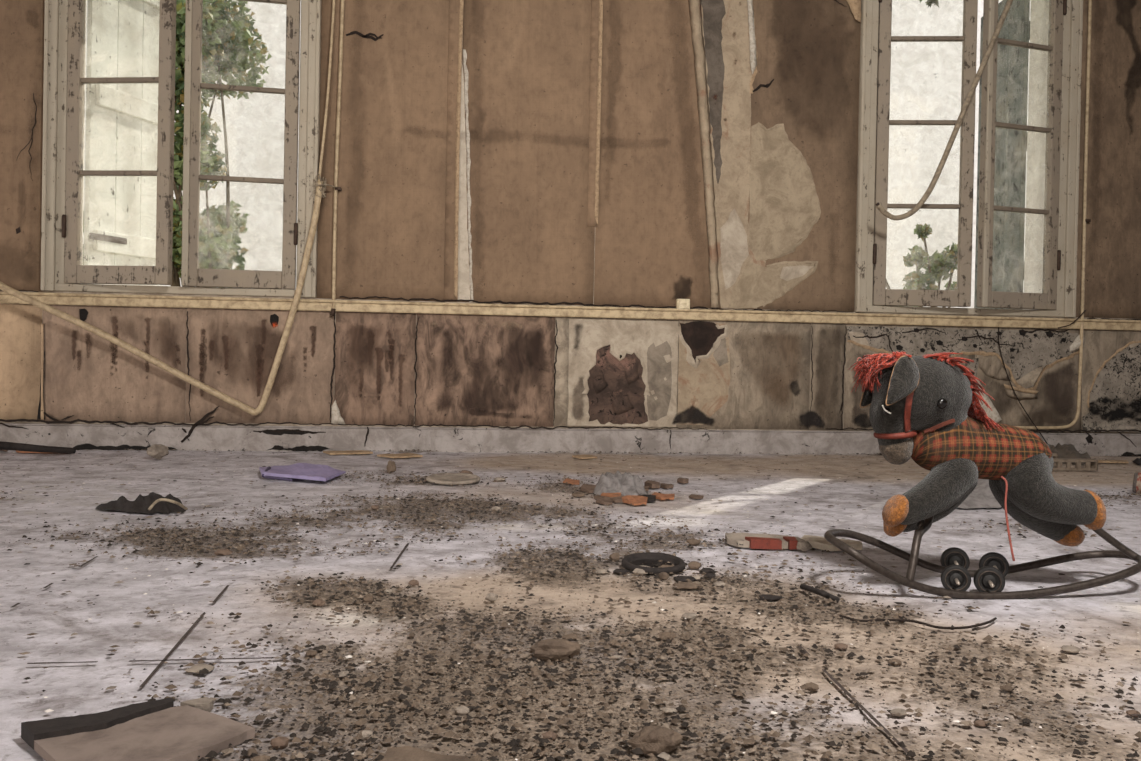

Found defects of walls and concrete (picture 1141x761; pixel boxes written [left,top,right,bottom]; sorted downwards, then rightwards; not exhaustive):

water stain [1118,0,1141,94]
peeling [587,0,603,227]
flaking render [689,0,821,309]
water stain [72,331,91,369]
water stain [200,329,234,396]
water stain [250,320,287,396]
water stain [304,326,316,371]
water stain [350,327,404,406]
water stain [438,328,545,418]
flaking render [568,319,730,427]
water stain [1036,365,1073,423]
flaking render [1082,340,1141,444]